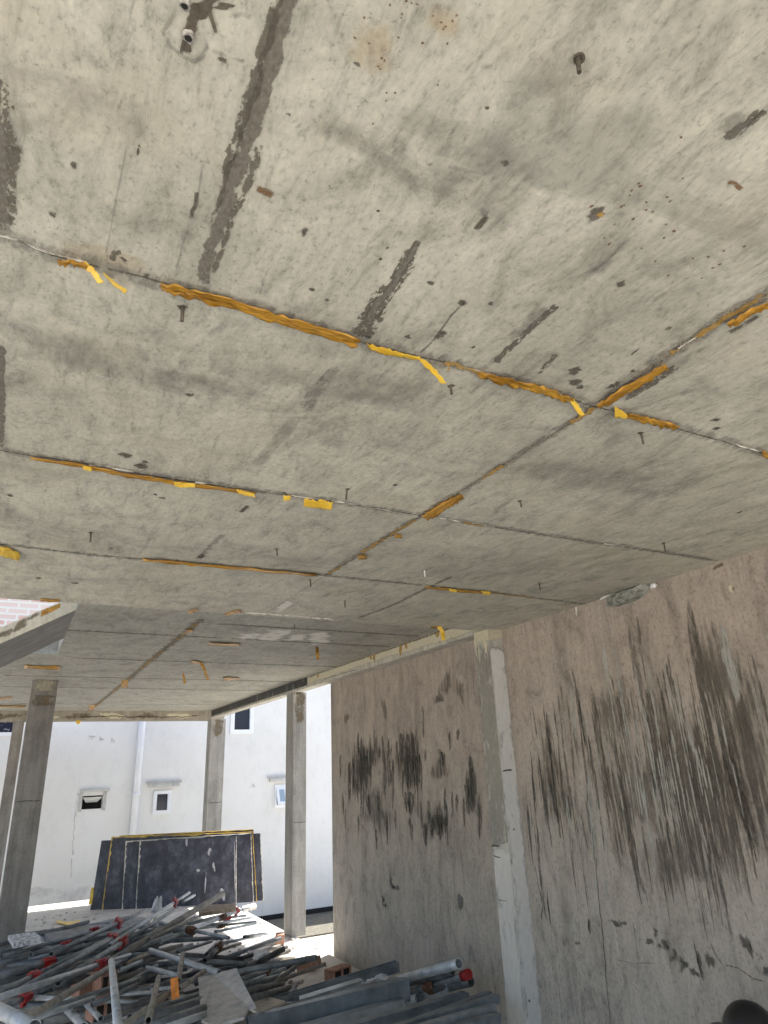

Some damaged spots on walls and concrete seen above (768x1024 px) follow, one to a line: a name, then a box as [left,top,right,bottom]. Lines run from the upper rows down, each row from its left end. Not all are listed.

water stain [295,602,768,1024]